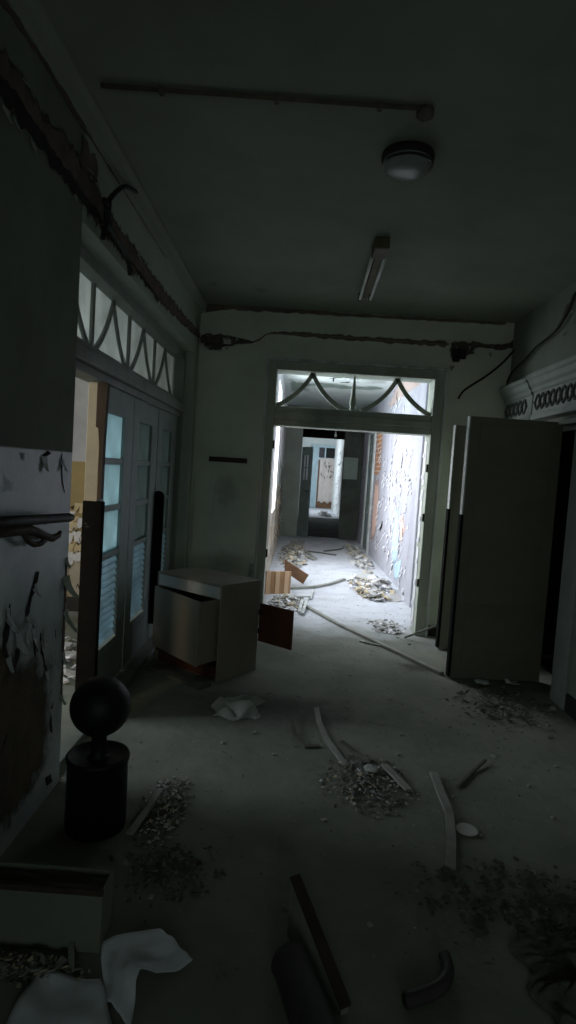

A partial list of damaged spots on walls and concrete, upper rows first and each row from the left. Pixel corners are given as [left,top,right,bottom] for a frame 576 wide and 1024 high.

flaking render [0,48,513,371]
peeling [0,503,83,828]
peeling [360,433,428,628]